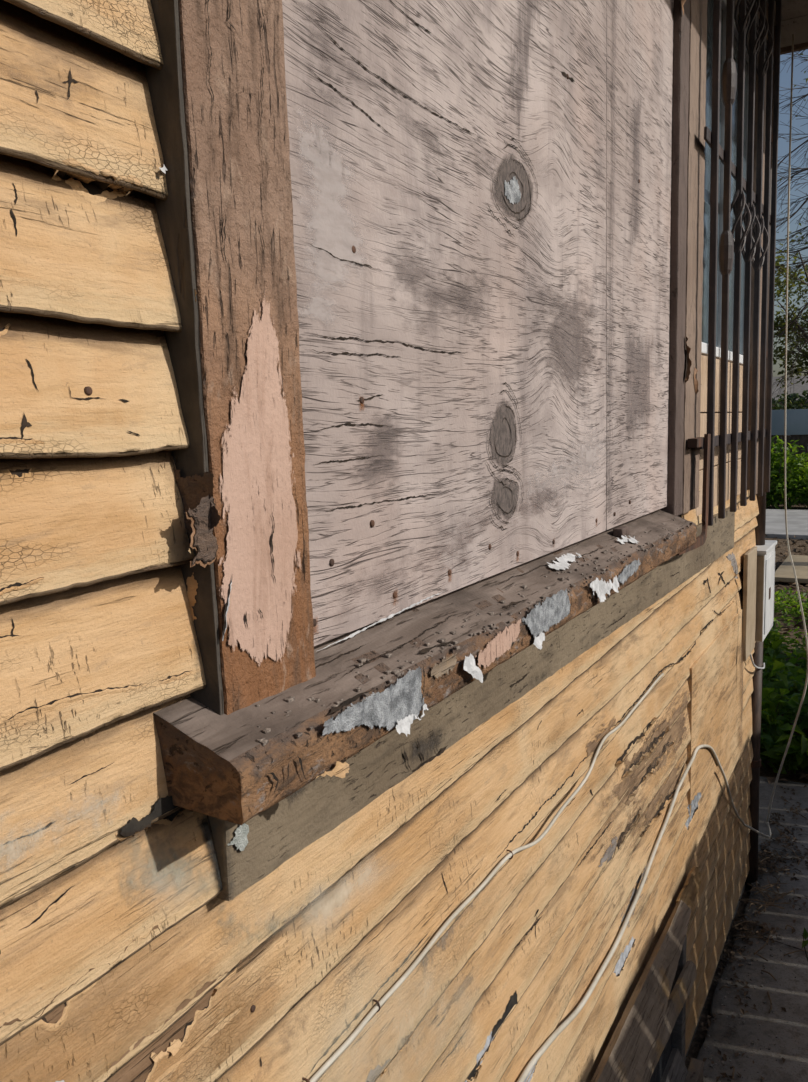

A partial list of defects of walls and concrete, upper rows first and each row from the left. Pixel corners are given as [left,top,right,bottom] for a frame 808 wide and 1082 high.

crack [10,183,18,237]
crack [26,359,38,390]
crack [69,388,129,402]
crack [0,412,44,444]
peeling [173,292,302,666]
peeling [590,558,641,602]
peeling [322,587,571,736]
crack [0,670,193,726]
crack [575,561,739,870]
crack [512,909,542,950]
peeling [102,960,242,1082]
peeling [465,1031,497,1082]